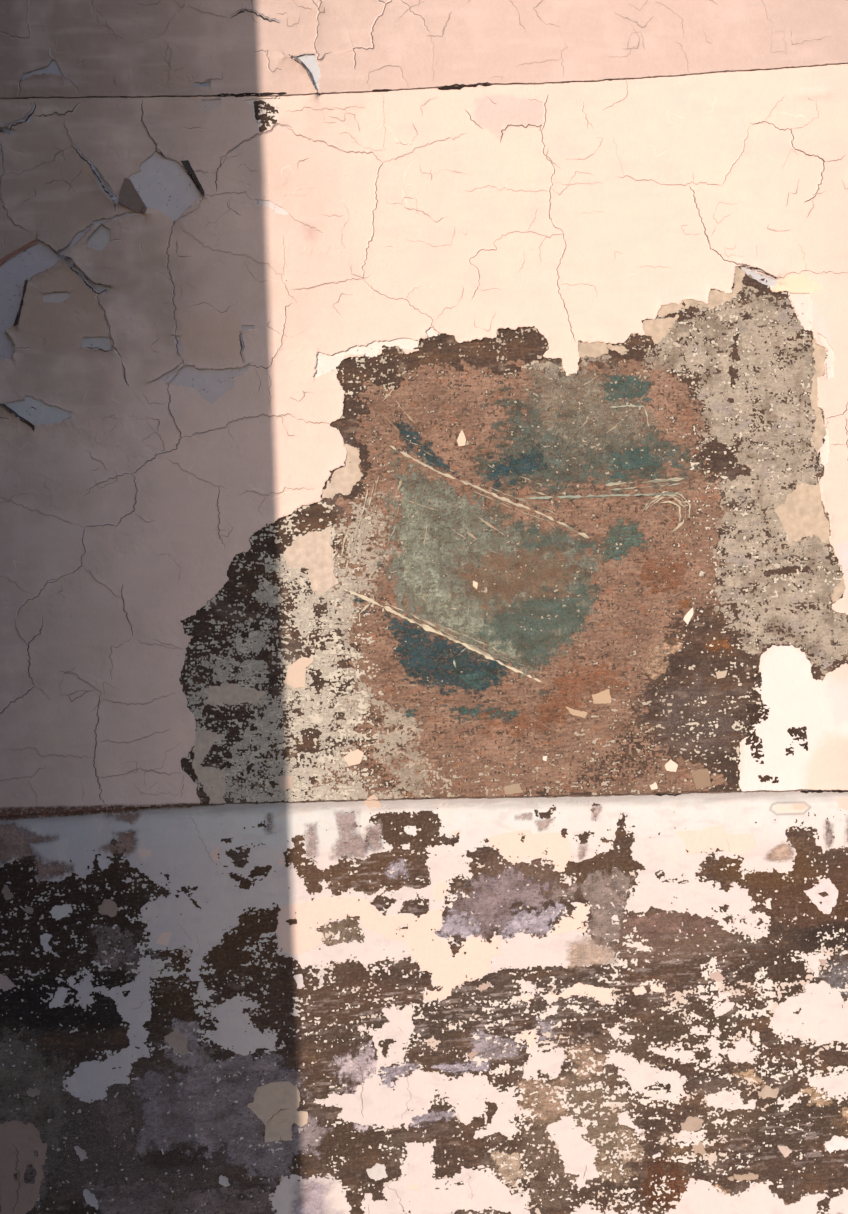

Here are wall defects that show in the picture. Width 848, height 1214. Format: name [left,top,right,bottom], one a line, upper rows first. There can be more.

peeling [287,54,321,95]
crack [0,0,848,861]
peeling [0,266,848,1214]